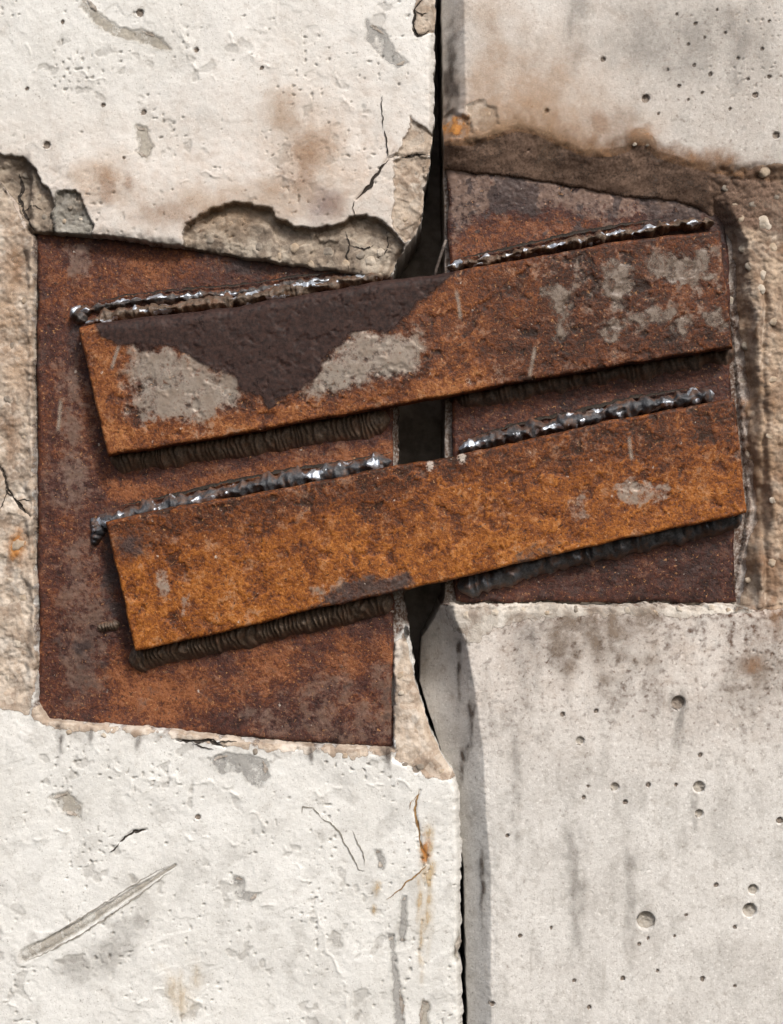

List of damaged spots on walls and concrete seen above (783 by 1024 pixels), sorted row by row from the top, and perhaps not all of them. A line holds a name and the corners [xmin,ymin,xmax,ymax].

crack [412,0,429,37]
spalling [182,116,432,279]
crack [345,101,430,270]
crack [0,466,30,516]
spalling [0,154,455,786]
crack [109,829,145,853]
crack [302,806,365,871]
crack [386,794,426,900]
rust [418,830,434,922]